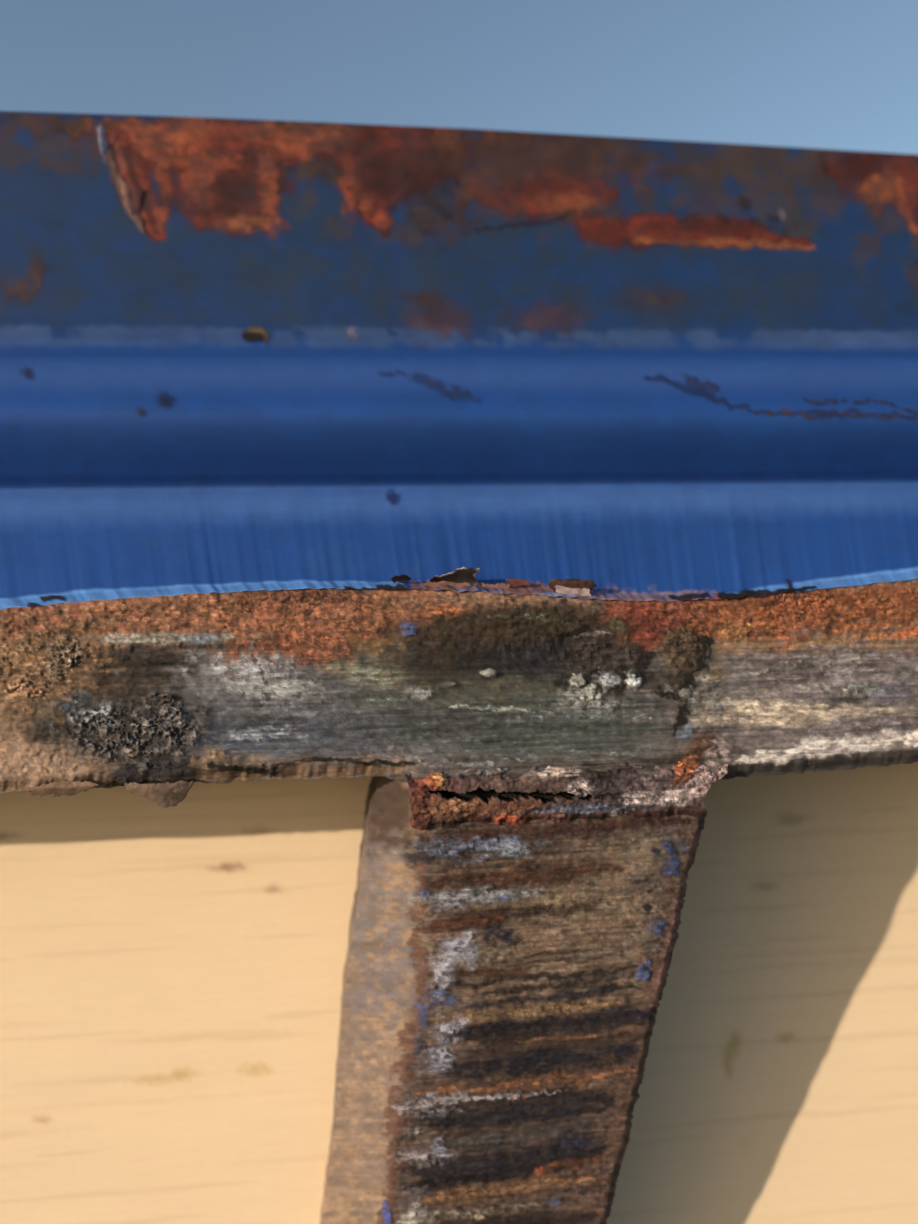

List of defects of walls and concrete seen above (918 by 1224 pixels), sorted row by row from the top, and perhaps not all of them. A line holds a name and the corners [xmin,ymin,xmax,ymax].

corrosion [51,115,815,250]
corrosion [823,151,918,237]
leakage [91,644,193,704]
corrosion [0,588,404,729]
corrosion [424,601,462,620]
peeling [28,614,918,816]
leakage [385,607,613,700]
leakage [679,664,725,738]
corrosion [621,585,918,649]
crack [207,756,410,777]
crack [425,786,626,803]